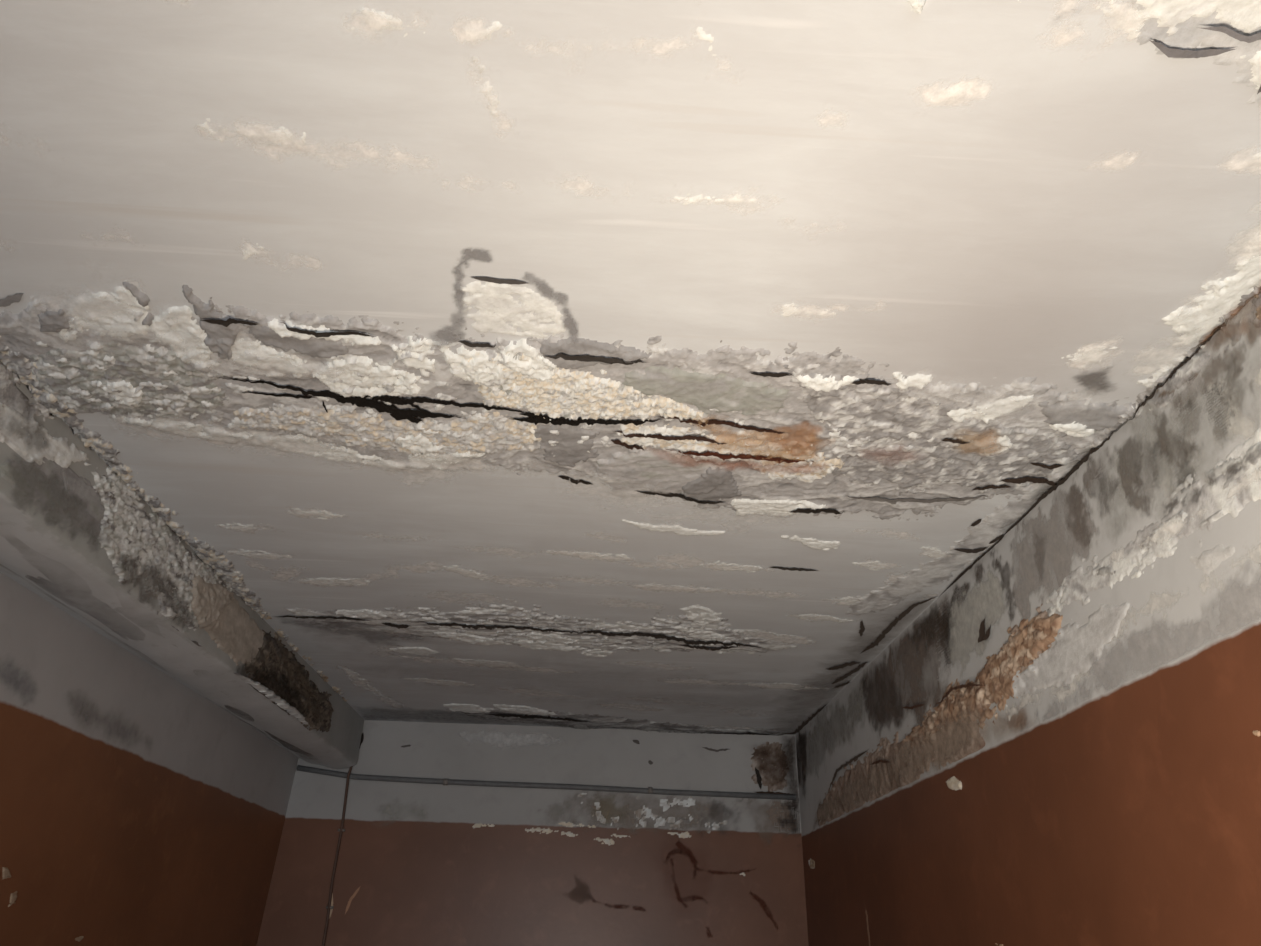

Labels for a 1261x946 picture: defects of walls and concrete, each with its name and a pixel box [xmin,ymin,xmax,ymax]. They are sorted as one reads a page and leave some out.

peeling [922,79,990,105]
peeling [1096,0,1261,104]
crack [459,340,496,348]
crack [545,353,649,365]
crack [211,377,814,464]
spalling [0,226,1261,732]
leakage [1115,384,1252,512]
crack [273,615,766,651]
leakage [764,461,1104,834]
peeling [817,427,1261,826]
spalling [443,695,797,796]
leakage [578,793,731,833]